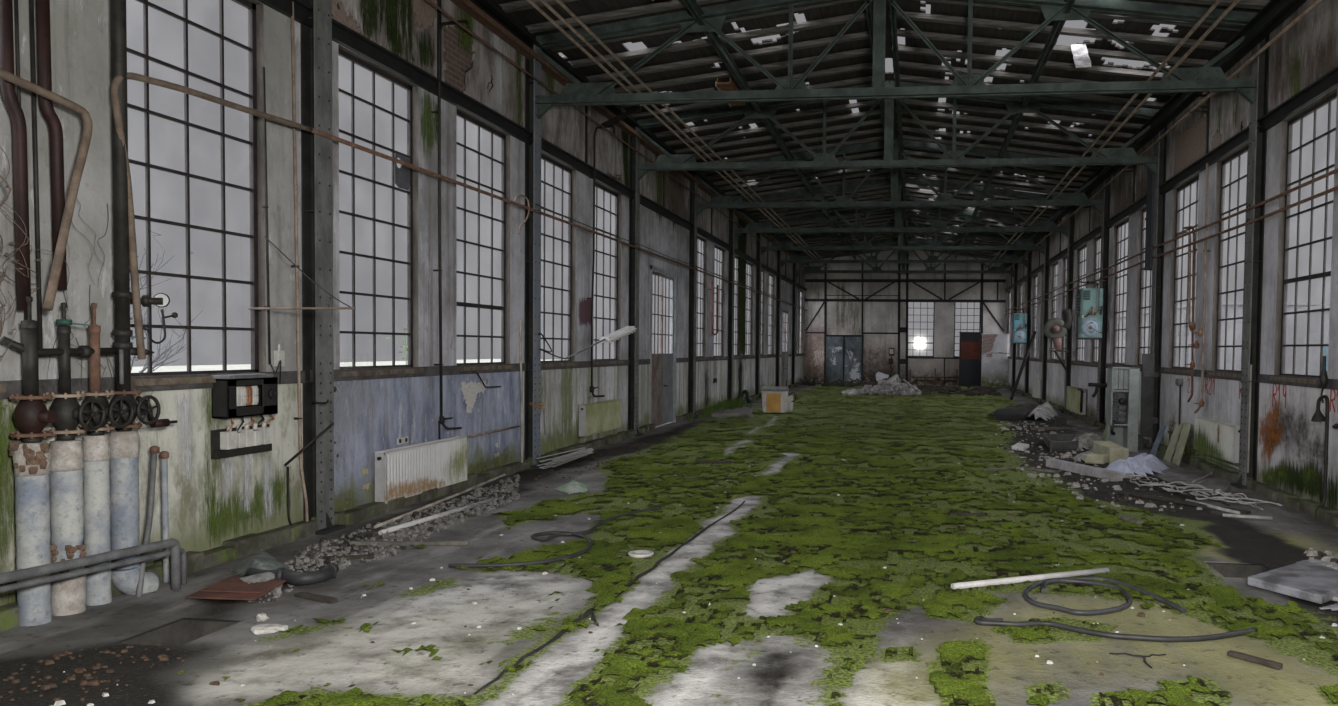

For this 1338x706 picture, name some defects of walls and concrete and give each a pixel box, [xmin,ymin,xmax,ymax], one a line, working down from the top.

peeling [461,379,488,414]
leakage [207,454,287,545]